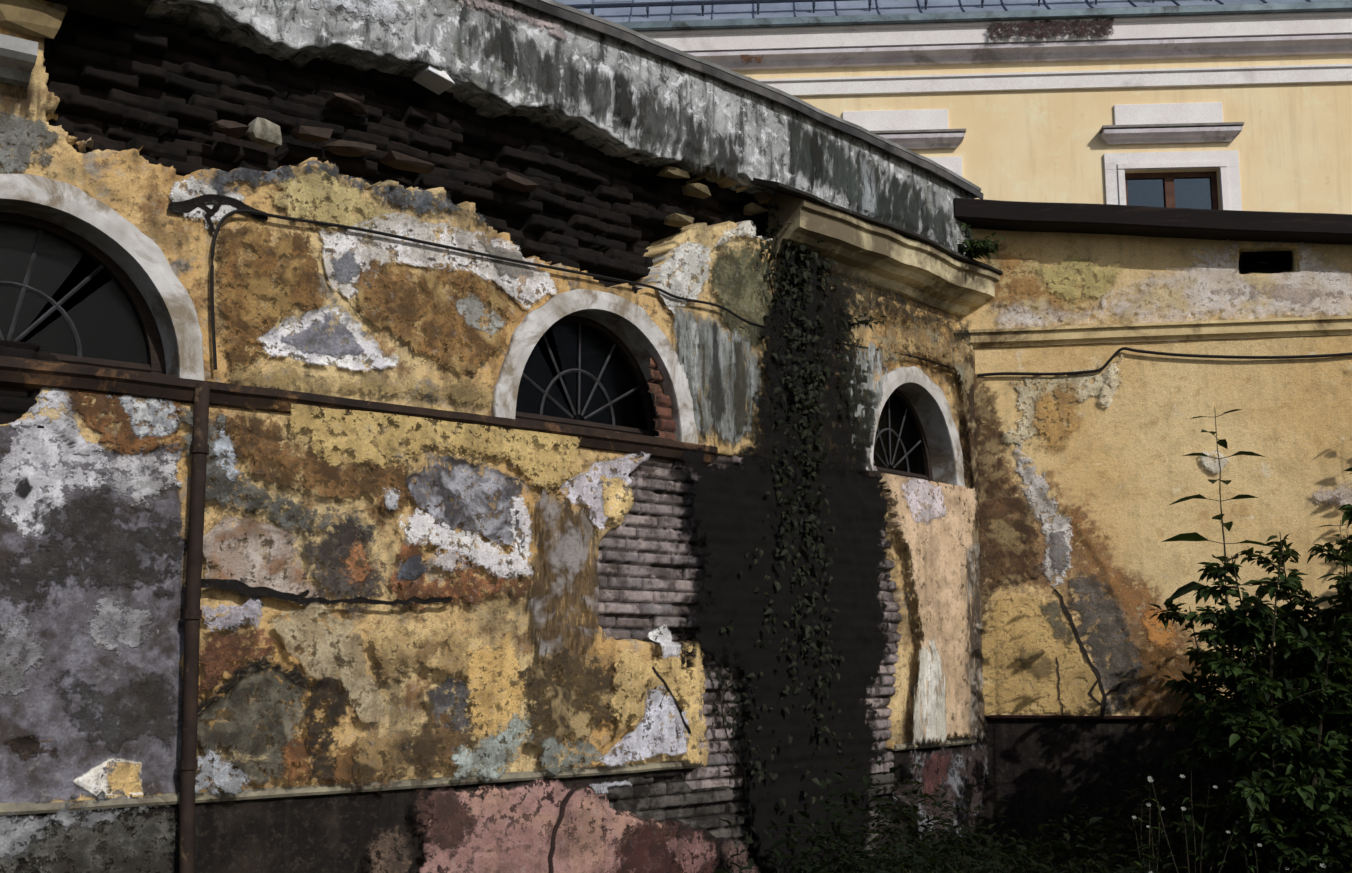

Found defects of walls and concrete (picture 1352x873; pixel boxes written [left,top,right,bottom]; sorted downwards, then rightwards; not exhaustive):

leakage [466,18,745,181]
spalling [0,9,773,371]
leakage [789,117,952,246]
peeling [848,340,888,471]
peeling [0,386,385,804]
crack [185,579,453,608]
spalling [368,453,775,873]
spalling [832,531,902,871]
peeling [901,478,947,526]
peeling [913,639,946,744]
leakage [674,243,1200,847]
crack [1054,589,1122,716]